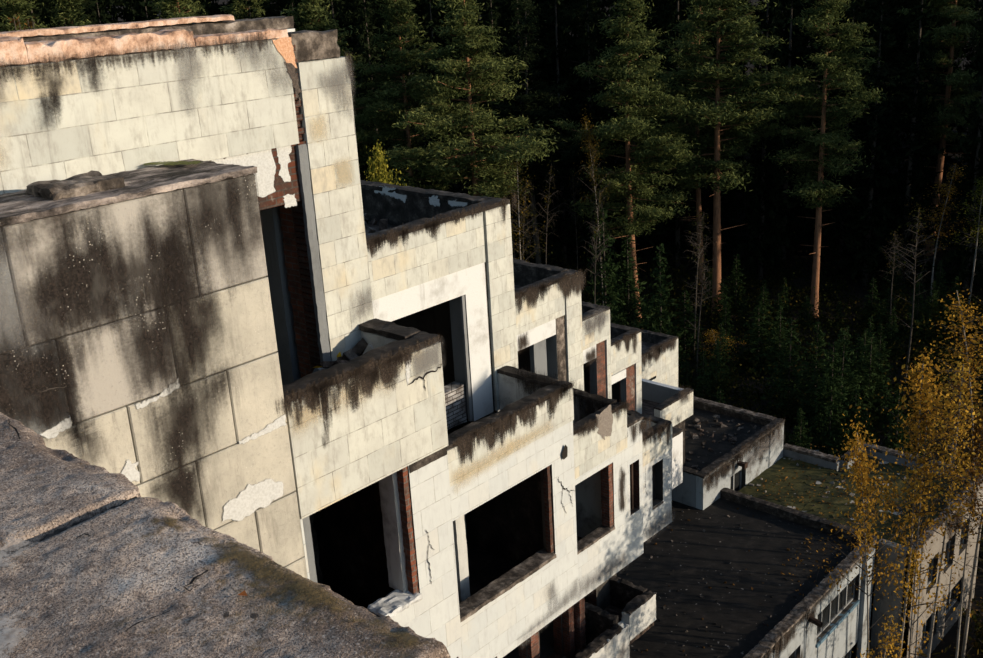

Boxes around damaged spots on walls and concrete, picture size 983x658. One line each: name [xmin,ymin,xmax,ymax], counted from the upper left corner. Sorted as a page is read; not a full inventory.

leakage [40,71,62,123]
flaking render [212,145,297,208]
leakage [367,194,516,257]
leakage [0,173,260,516]
leakage [614,333,676,365]
flaking render [40,418,72,439]
leakage [276,338,441,446]
crack [409,364,442,391]
leakage [453,366,634,463]
leakage [627,416,681,446]
flaking render [121,459,140,482]
flaking render [223,478,284,521]